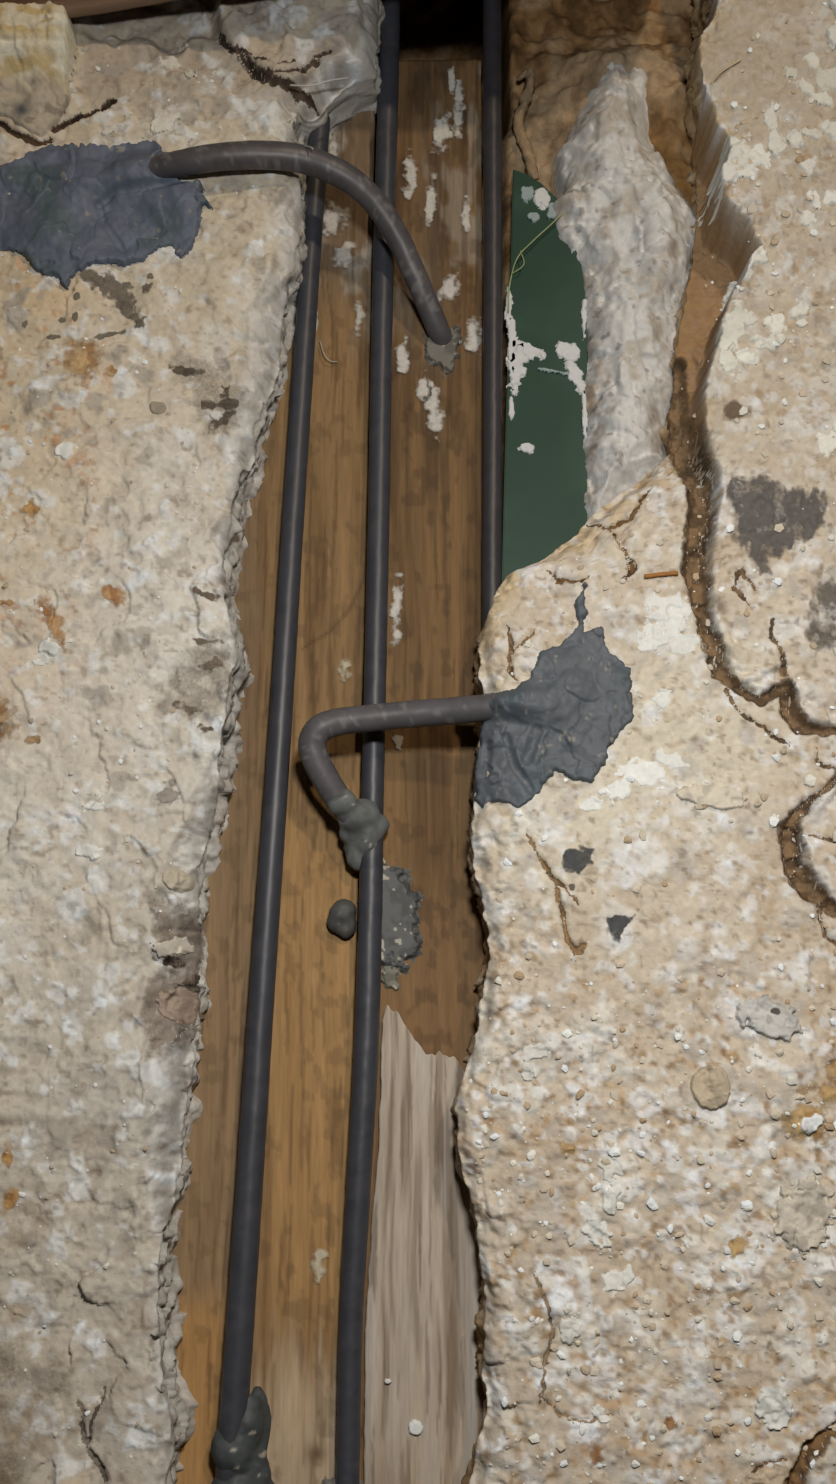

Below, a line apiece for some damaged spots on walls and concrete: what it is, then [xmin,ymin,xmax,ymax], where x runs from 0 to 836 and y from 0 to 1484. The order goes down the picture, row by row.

peeling [433,67,466,151]
peeling [323,201,356,268]
peeling [403,158,436,226]
peeling [521,186,556,223]
spalling [169,366,239,429]
peeling [397,337,445,438]
peeling [465,319,482,351]
peeling [504,286,588,443]
damp [727,475,827,574]
peeling [390,573,403,644]
crack [546,360,836,946]
crack [751,1422,836,1484]